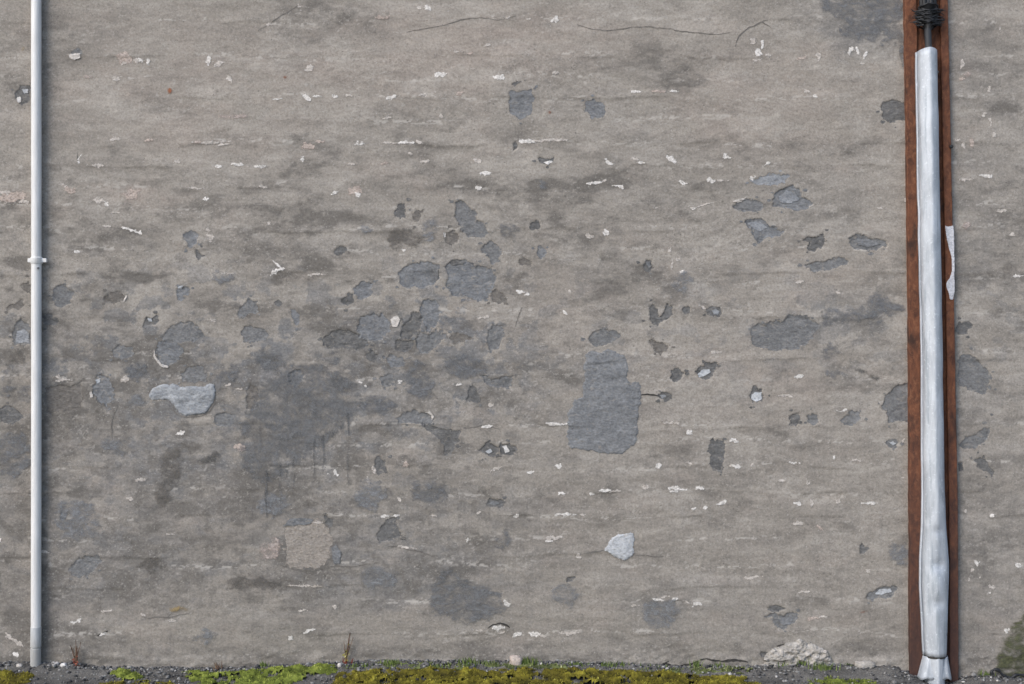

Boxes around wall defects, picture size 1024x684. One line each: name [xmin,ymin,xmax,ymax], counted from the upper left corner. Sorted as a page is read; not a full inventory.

crack [409,16,514,32]
crack [580,20,771,47]
flaking render [493,74,538,124]
flaking render [733,162,813,247]
flaking render [317,198,530,363]
flaking render [143,311,213,384]
flaking render [748,314,820,351]
flaking render [955,316,996,395]
leakage [239,348,396,516]
flaking render [706,438,753,475]